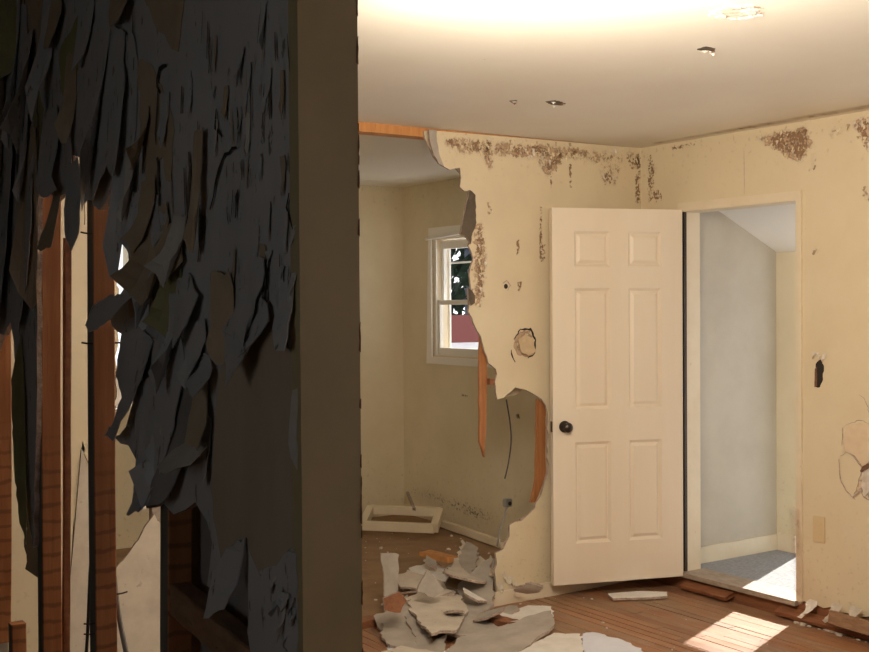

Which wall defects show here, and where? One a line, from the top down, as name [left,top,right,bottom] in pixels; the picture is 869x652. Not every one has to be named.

peeling [446,138,638,184]
water stain [628,154,662,203]
peeling [471,224,487,307]
peeling [0,0,294,619]
flaking render [511,328,536,362]
spalling [812,352,826,388]